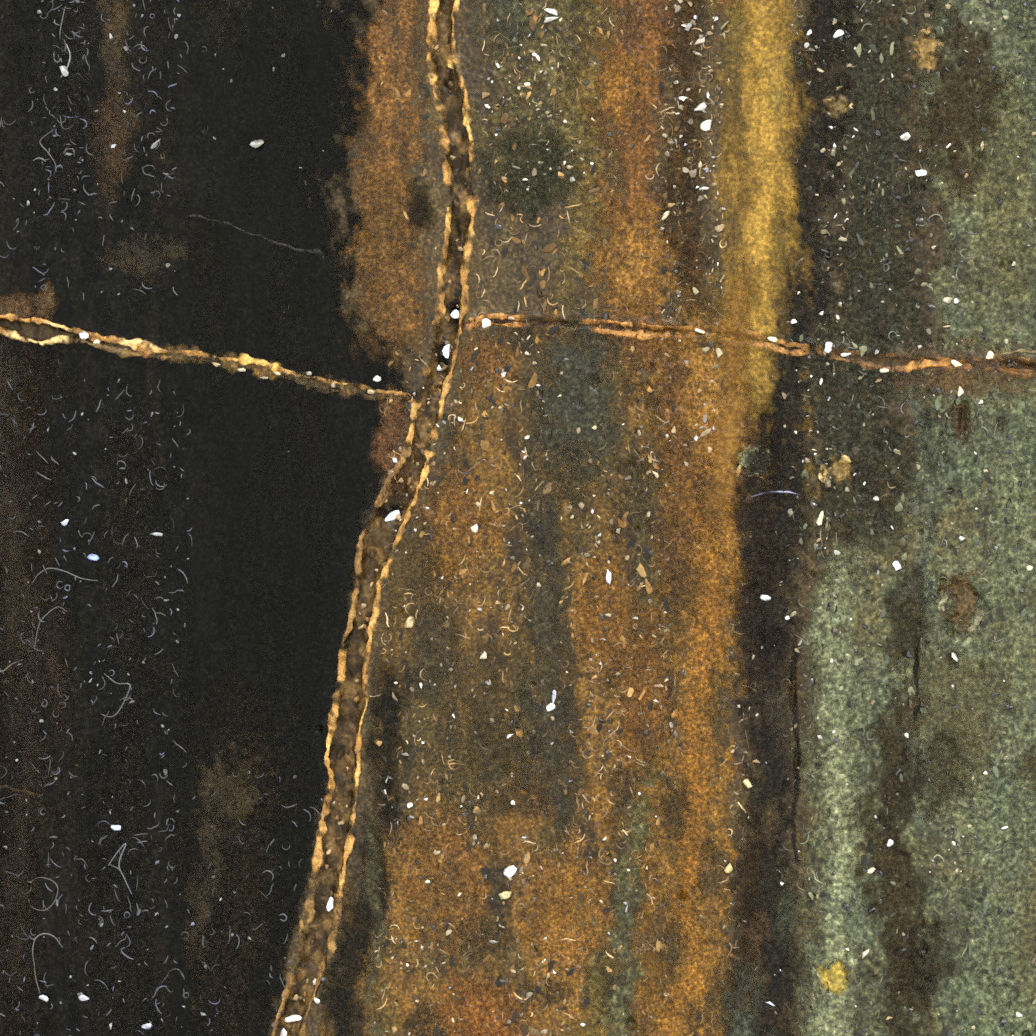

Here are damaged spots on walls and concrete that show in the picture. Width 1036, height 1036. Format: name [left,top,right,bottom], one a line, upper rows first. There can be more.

crack [0,785,34,795]
crack [0,313,405,400]
crack [191,215,318,253]
corrosion [319,0,755,1036]
crack [271,0,1036,1036]
water stain [725,0,1036,1036]